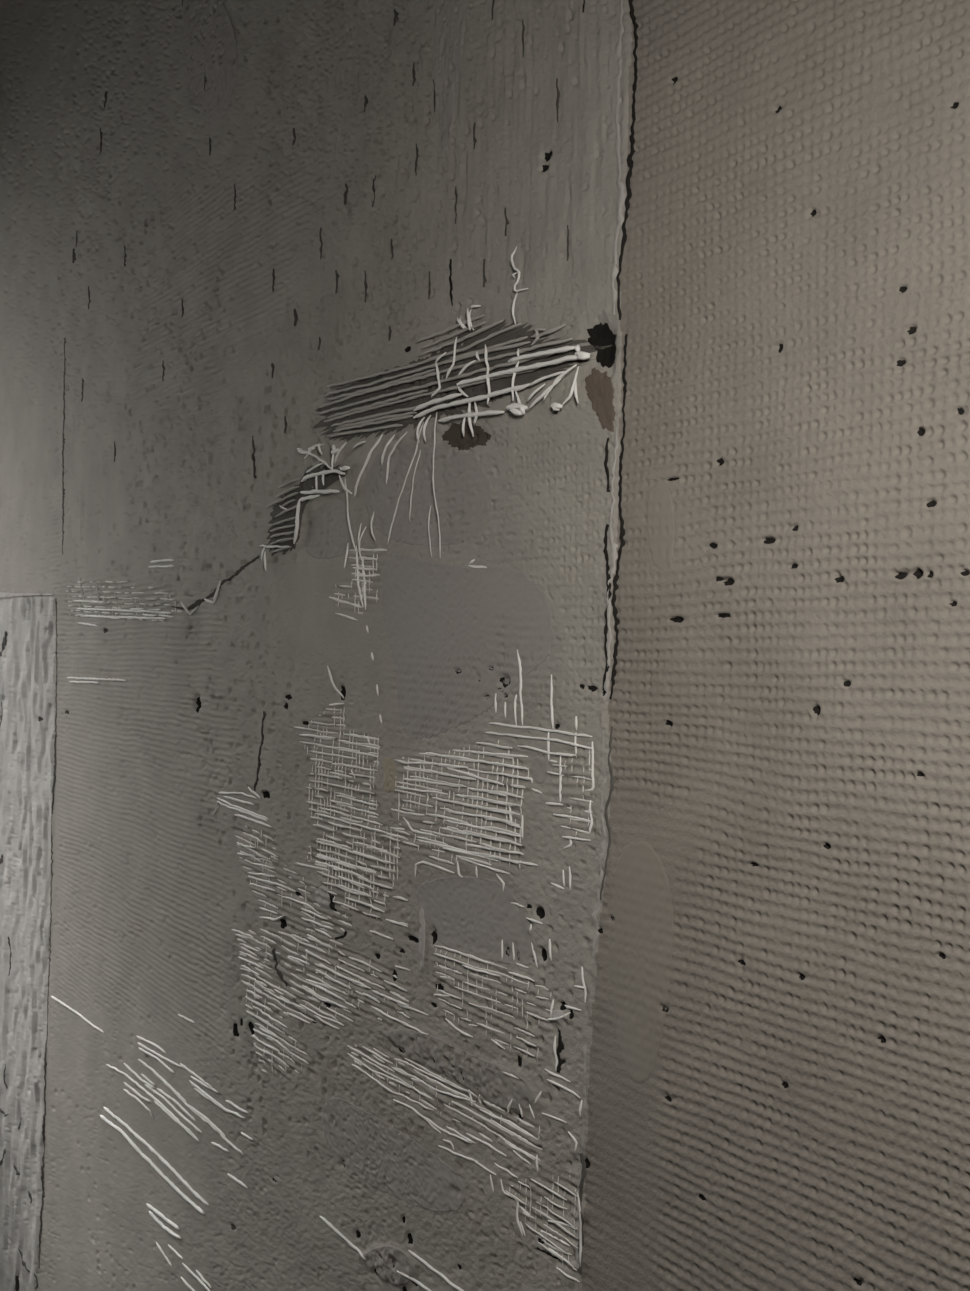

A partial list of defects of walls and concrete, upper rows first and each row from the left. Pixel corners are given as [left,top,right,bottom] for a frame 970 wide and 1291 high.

flaking render [587,322,616,368]
crack [250,436,258,478]
crack [600,0,639,900]
crack [171,555,259,611]
flaking render [399,876,547,969]
spalling [233,1018,255,1037]
flaking render [386,1029,535,1120]
flaking render [356,1216,418,1291]